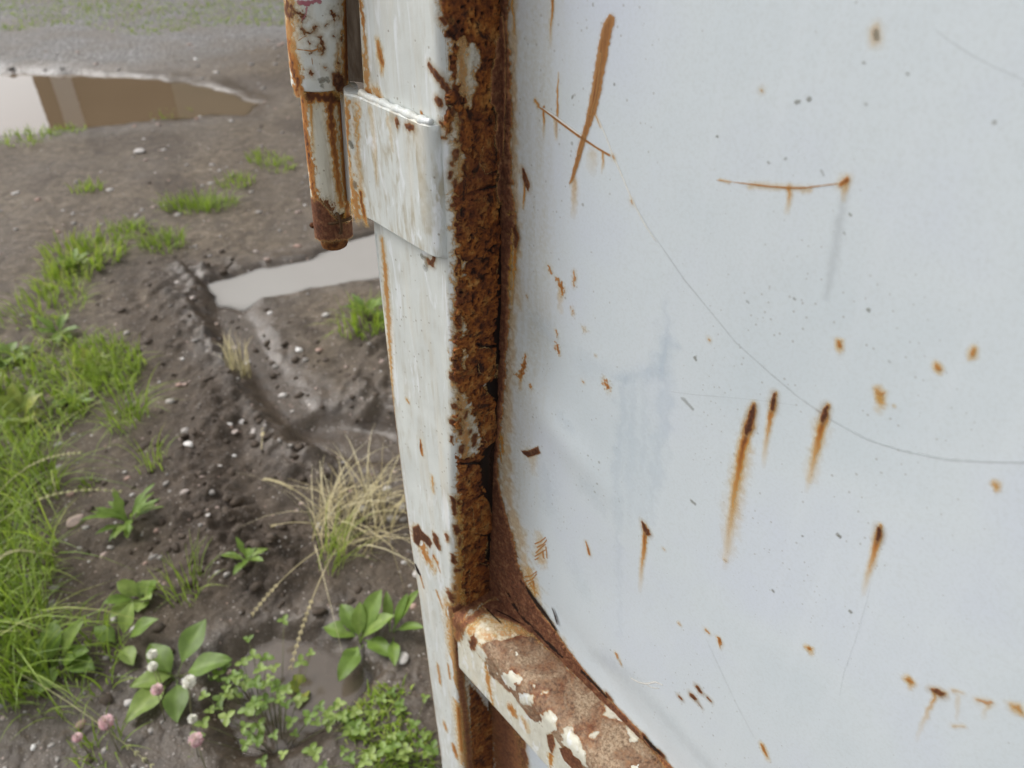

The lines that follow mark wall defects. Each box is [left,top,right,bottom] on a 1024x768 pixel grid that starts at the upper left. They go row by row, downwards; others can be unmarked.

corrosion [284,0,367,225]
corrosion [381,238,393,396]
corrosion [436,0,673,768]
corrosion [732,392,777,506]
corrosion [813,404,830,459]
corrosion [869,524,882,567]
peeling [468,634,670,768]